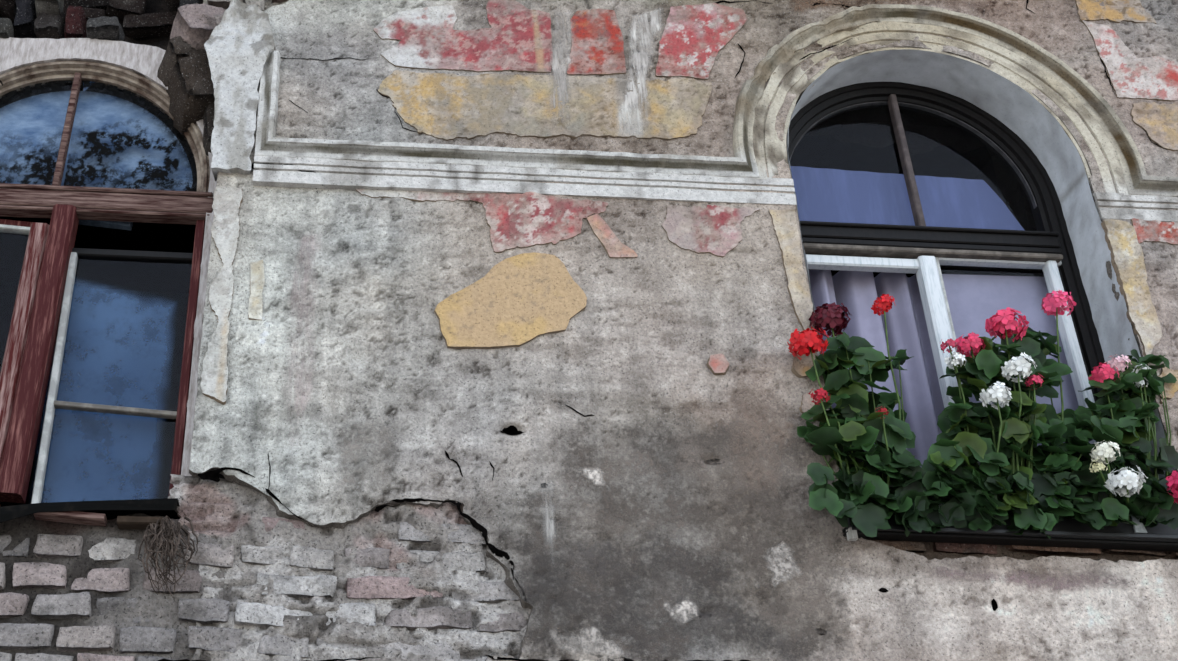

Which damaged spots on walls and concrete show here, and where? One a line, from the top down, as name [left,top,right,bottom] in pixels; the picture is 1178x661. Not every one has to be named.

spalling [203,0,289,12]
peeling [1075,0,1178,151]
peeling [200,186,243,405]
peeling [355,189,638,349]
peeling [1101,218,1178,404]
crack [203,453,312,526]
spalling [0,474,531,661]
crack [374,451,527,601]
damp [520,400,848,661]
spalling [871,540,1178,562]
crack [486,653,634,661]
crack [662,653,750,661]